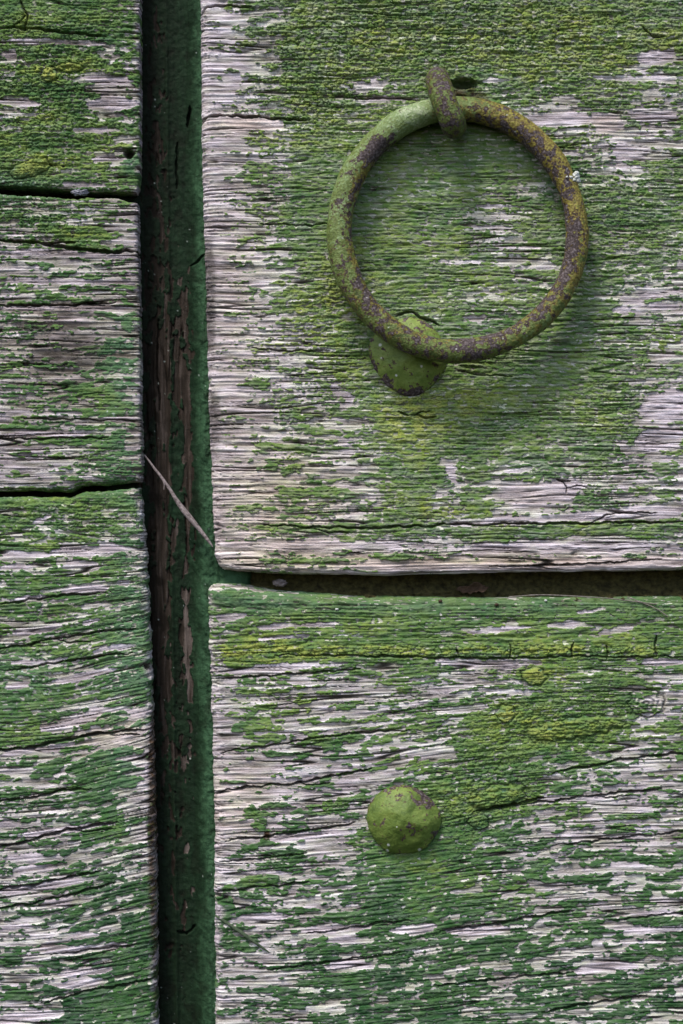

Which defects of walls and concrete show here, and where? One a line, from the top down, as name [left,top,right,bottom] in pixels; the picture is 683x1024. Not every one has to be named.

peeling [3,92,61,115]
peeling [77,72,141,181]
peeling [60,198,139,231]
peeling [206,0,683,572]
peeling [0,249,140,479]
peeling [209,611,358,646]
peeling [449,603,637,641]
peeling [428,659,523,709]
peeling [620,659,683,718]
peeling [0,483,194,1024]
peeling [211,659,369,854]
peeling [215,751,683,1024]